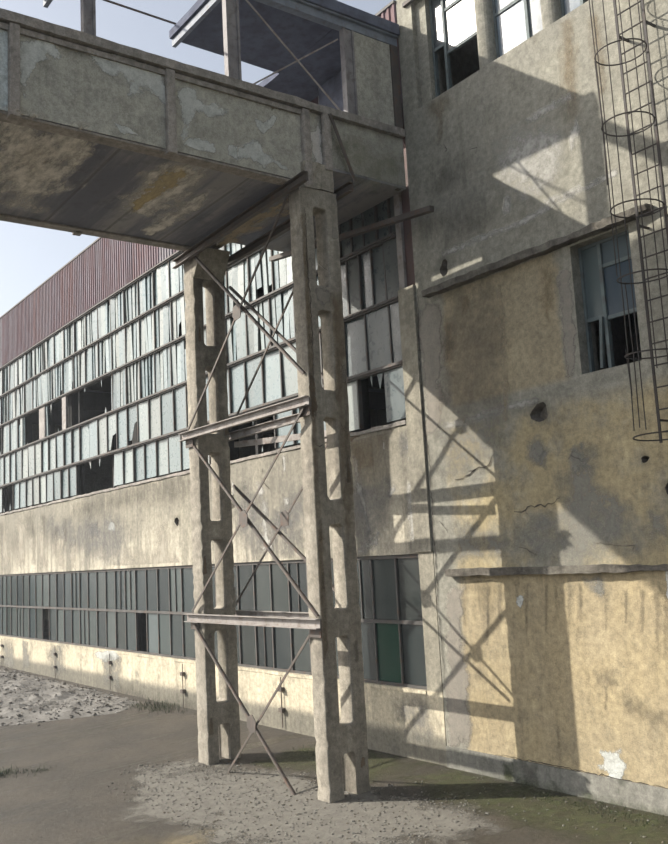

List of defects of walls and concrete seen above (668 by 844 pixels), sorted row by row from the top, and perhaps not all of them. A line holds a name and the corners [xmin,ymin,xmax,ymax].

peeling [20,39,60,96]
peeling [91,54,165,104]
leakage [0,115,91,211]
peeling [177,87,228,153]
peeling [228,100,287,170]
leakage [125,164,204,235]
leakage [219,203,289,248]
hole [530,402,548,422]
crack [417,282,447,679]
peeling [599,750,626,779]